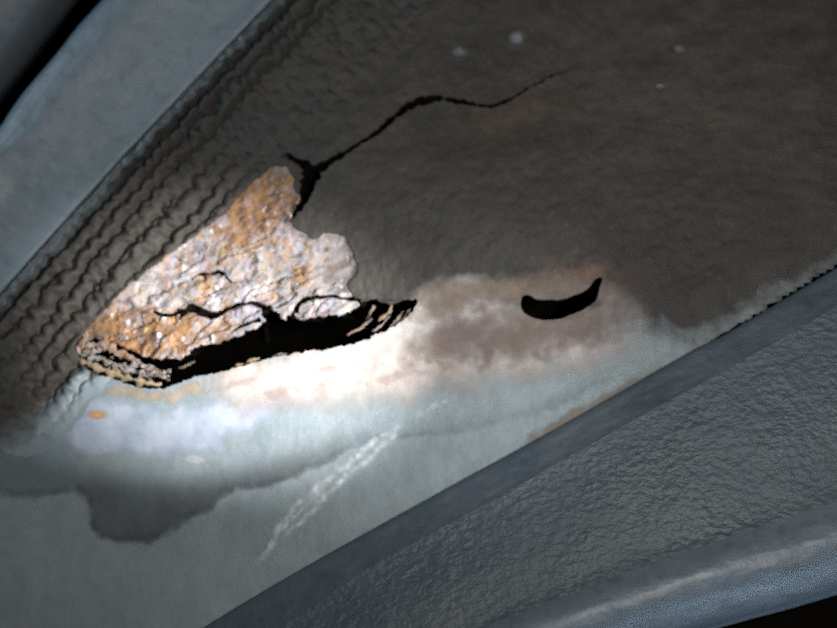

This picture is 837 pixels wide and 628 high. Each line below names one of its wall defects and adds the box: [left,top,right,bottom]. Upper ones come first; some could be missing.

crack [286,75,553,220]
rust [75,166,360,360]
peeling [0,0,451,451]
efflorescence [70,397,270,464]
water stain [266,439,385,551]